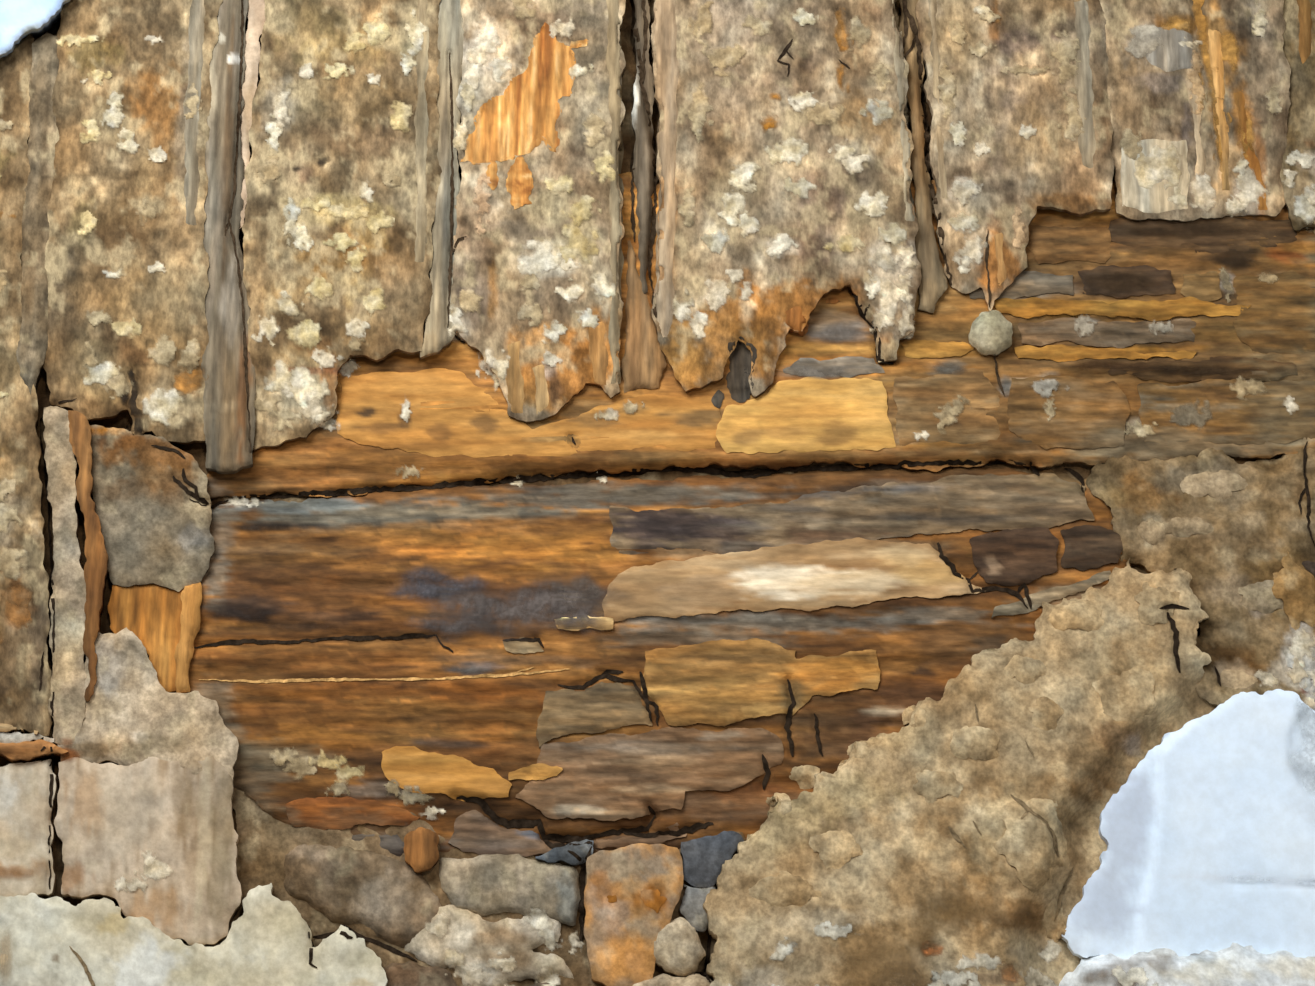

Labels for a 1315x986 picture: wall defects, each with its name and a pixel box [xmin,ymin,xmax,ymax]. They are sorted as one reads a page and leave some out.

peeling [299,10,427,84]
peeling [283,173,401,271]
peeling [678,118,816,256]
peeling [825,191,916,338]
peeling [1283,150,1315,233]
peeling [251,277,385,430]
spalling [711,336,757,408]
water stain [795,367,844,378]
water stain [1082,363,1231,376]
crack [151,437,1085,508]
crack [39,398,77,889]
crack [762,679,823,790]